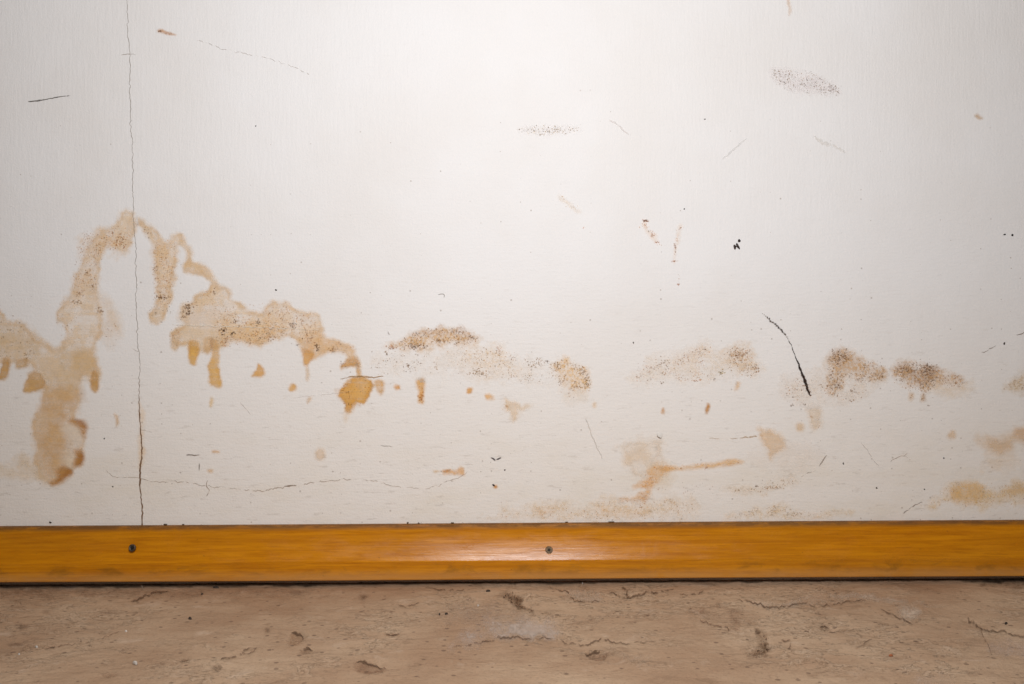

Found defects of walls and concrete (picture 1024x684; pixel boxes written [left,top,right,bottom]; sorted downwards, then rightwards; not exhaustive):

damp [0,217,383,484]
crack [109,5,399,525]
damp [377,328,477,368]
damp [825,350,961,395]